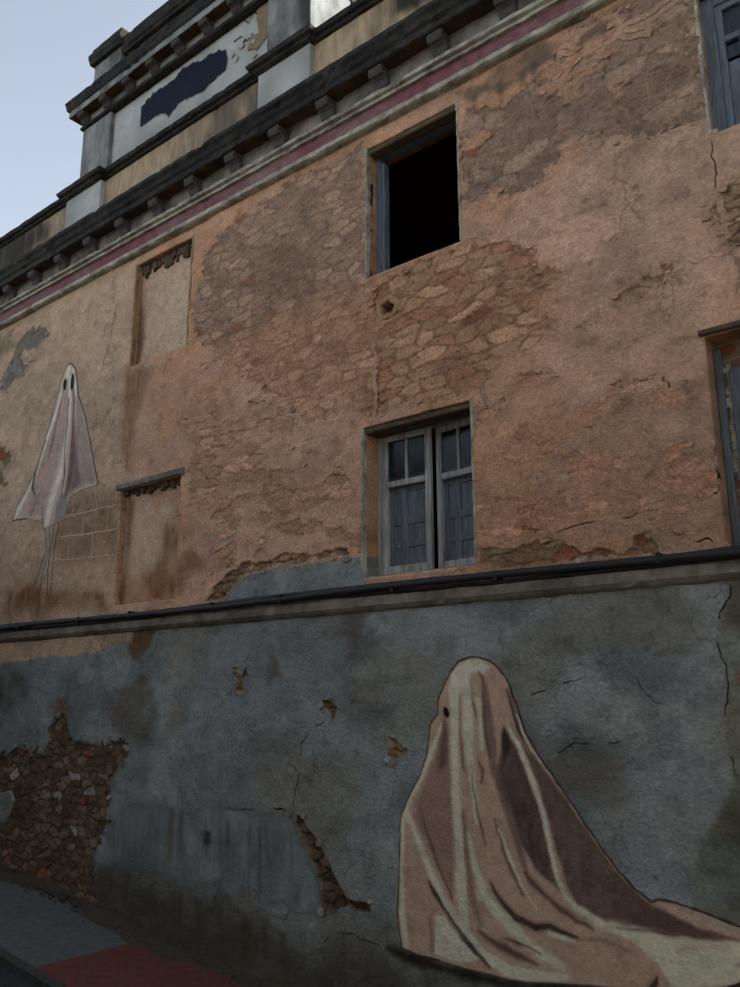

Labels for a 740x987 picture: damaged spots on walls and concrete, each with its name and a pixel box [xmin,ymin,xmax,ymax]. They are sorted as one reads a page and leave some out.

peeling [457,0,706,211]
peeling [0,322,49,397]
peeling [124,135,694,603]
peeling [0,443,18,491]
spalling [317,694,342,725]
spalling [383,730,414,767]
crack [707,580,740,796]
spalling [0,709,135,909]
spalling [285,808,376,921]